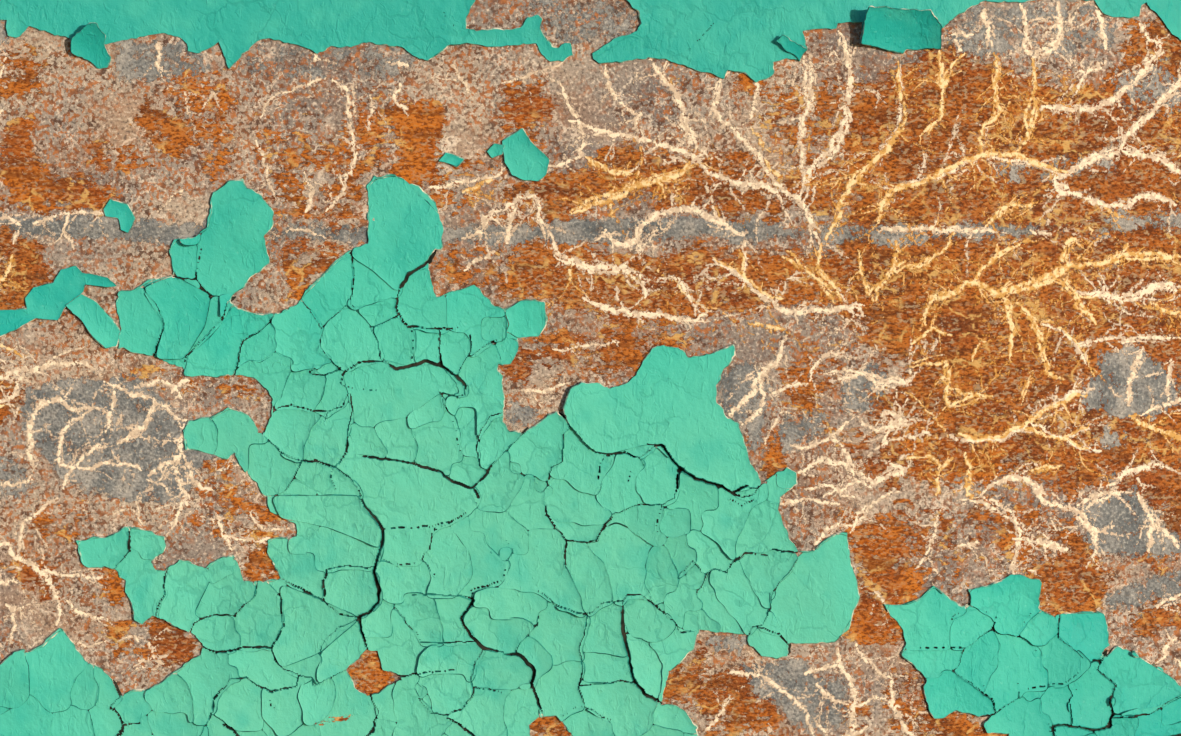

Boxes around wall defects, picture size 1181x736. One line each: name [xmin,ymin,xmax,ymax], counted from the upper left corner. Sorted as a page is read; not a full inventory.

peeling [0,177,81,224]
rust [0,58,248,224]
leakage [442,214,805,250]
peeling [563,187,864,263]
rust [247,17,1181,736]
leakage [1080,342,1181,450]
crack [190,250,528,736]
crack [545,413,759,568]
leakage [1081,471,1181,610]
peeling [1144,493,1181,543]
rust [82,567,198,674]
crack [397,581,686,736]